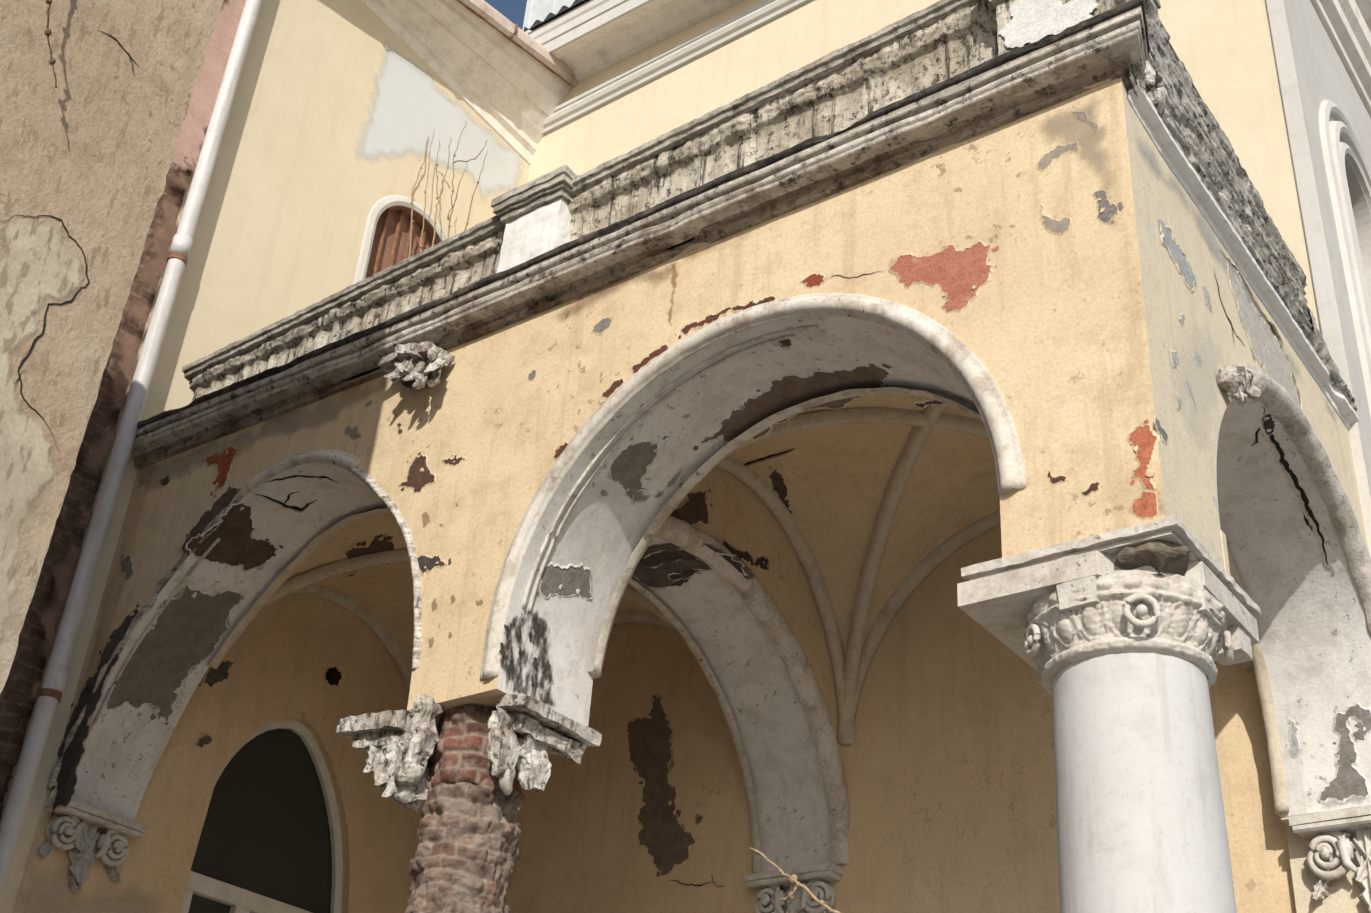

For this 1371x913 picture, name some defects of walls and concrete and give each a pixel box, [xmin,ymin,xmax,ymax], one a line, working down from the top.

flaking render [998,0,1098,48]
peeling [359,48,521,196]
crack [0,215,90,452]
spalling [888,241,999,314]
crack [1214,250,1302,410]
spalling [693,362,891,451]
spalling [180,485,283,572]
crack [253,475,342,513]
crack [1252,408,1334,575]
spalling [50,584,244,818]
peeling [498,562,593,705]
spalling [1317,703,1371,806]